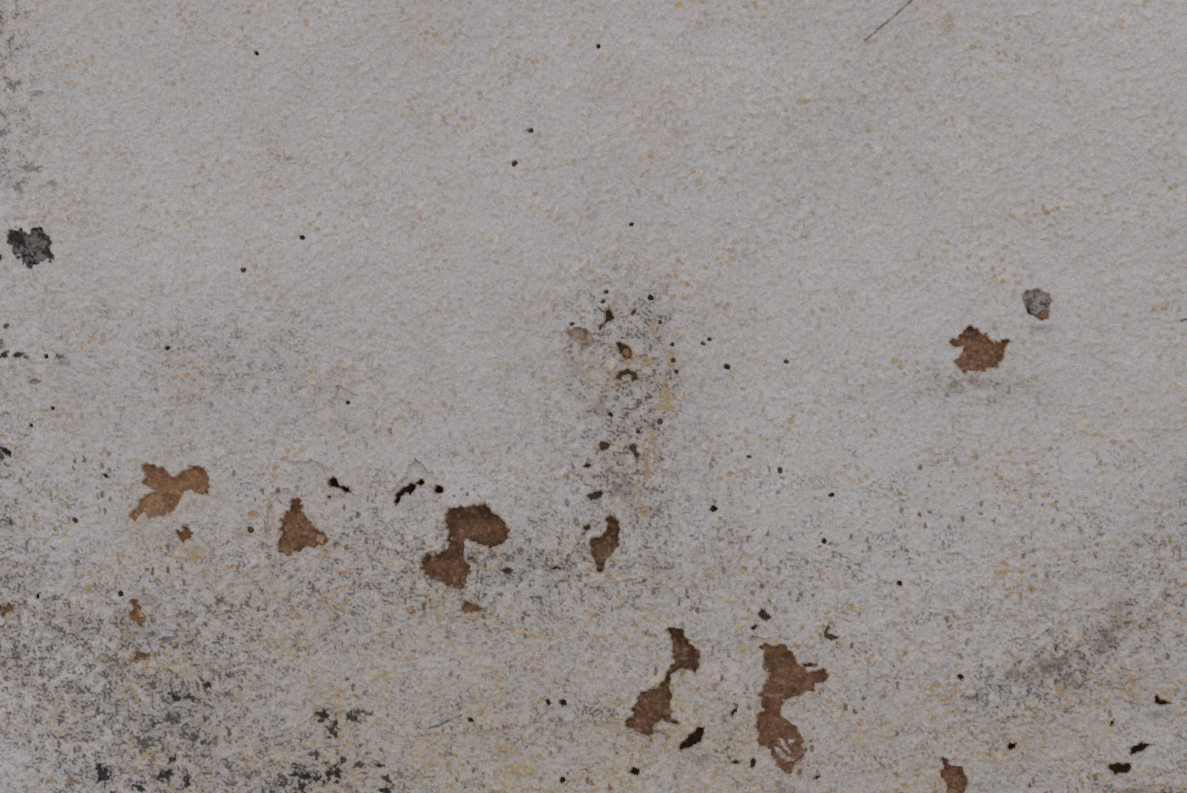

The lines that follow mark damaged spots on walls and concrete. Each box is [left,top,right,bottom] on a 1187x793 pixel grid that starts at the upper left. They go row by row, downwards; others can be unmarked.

spalling [0,225,57,269]
spalling [1019,286,1055,323]
flaking render [947,323,1012,376]
flaking render [127,461,212,546]
flaking render [263,486,331,558]
flaking render [379,456,516,616]
flaking render [583,513,623,576]
flaking render [623,626,704,750]
flaking render [732,609,833,776]
flaking render [938,756,971,793]